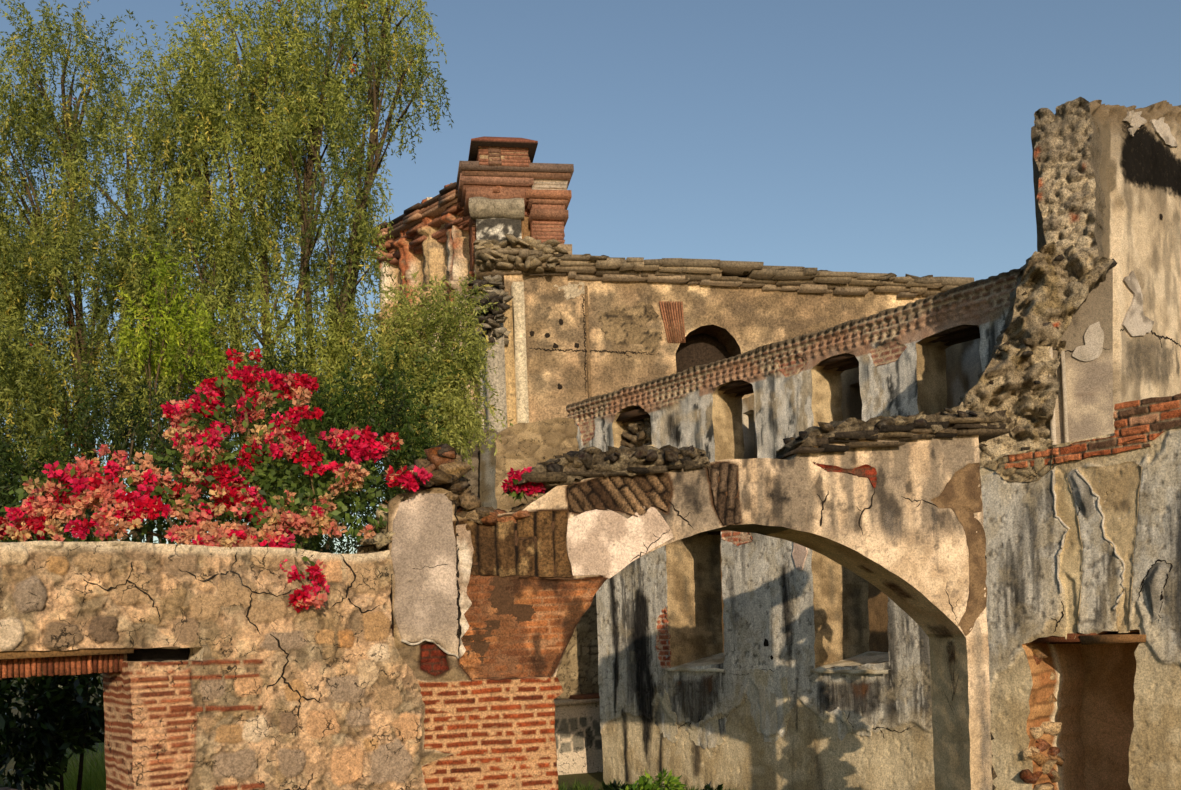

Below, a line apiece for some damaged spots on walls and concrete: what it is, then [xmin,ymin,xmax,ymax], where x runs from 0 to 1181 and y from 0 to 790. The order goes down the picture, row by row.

flaking render [1121,271,1154,337]
flaking render [1072,321,1104,362]
crack [817,491,829,527]
crack [857,489,937,535]
flaking render [931,446,1142,639]
damp [1167,496,1181,629]
crack [179,553,322,718]
flaking render [401,474,672,790]
damp [781,566,797,663]
flaking render [652,689,727,749]
flaking render [742,669,791,743]
flaking render [818,707,873,742]